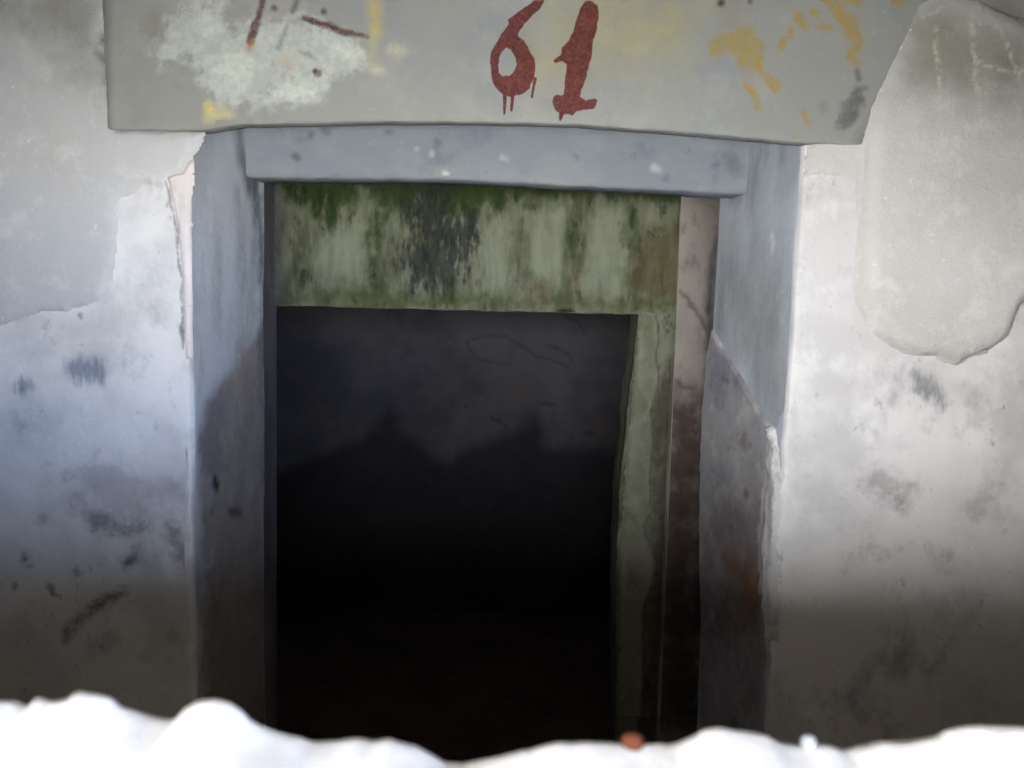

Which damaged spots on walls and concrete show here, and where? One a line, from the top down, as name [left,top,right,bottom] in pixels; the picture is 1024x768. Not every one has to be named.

peeling [168,160,195,359]
leakage [1,166,680,727]
spalling [0,312,1024,768]
leakage [622,339,706,745]